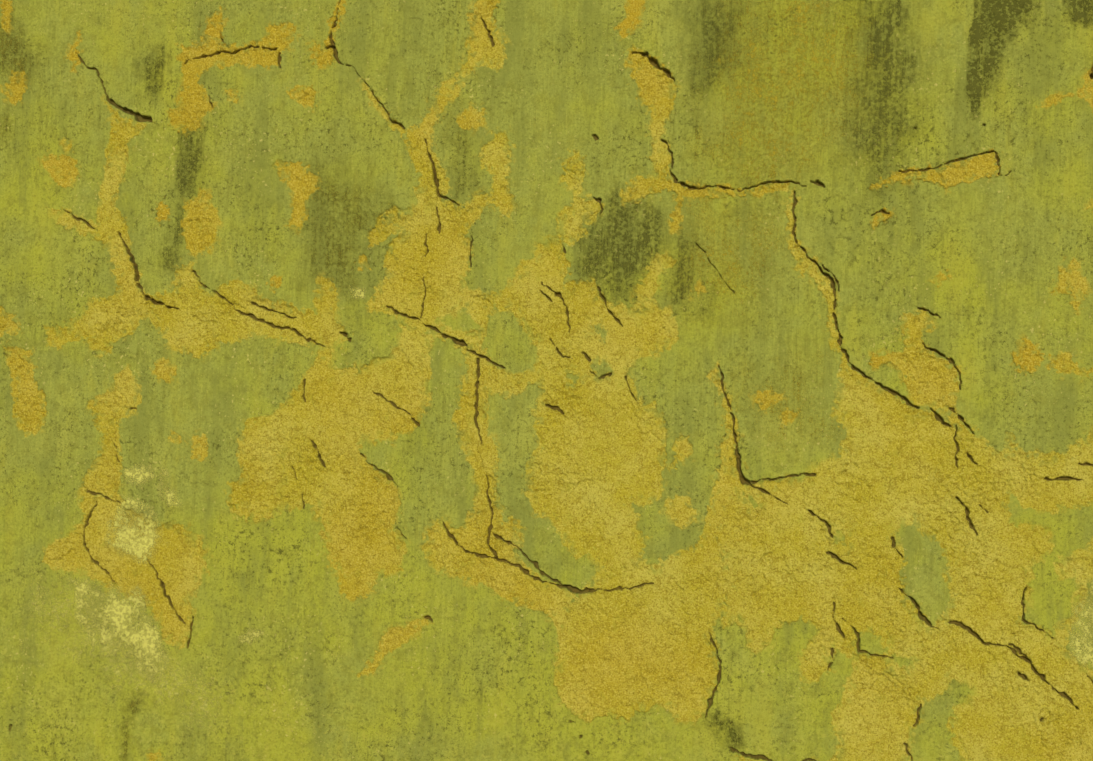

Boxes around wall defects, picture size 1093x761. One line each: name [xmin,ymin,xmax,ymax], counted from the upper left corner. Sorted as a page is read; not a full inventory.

water stain [967,0,1032,115]
water stain [1064,0,1093,27]
crack [325,0,506,444]
spalling [0,306,49,439]
crack [191,271,352,347]
spalling [42,0,576,650]
spalling [482,47,1093,761]
crack [718,365,857,570]
crack [661,139,979,468]
crack [442,475,654,595]
spalling [356,615,434,679]
crack [899,587,1093,710]